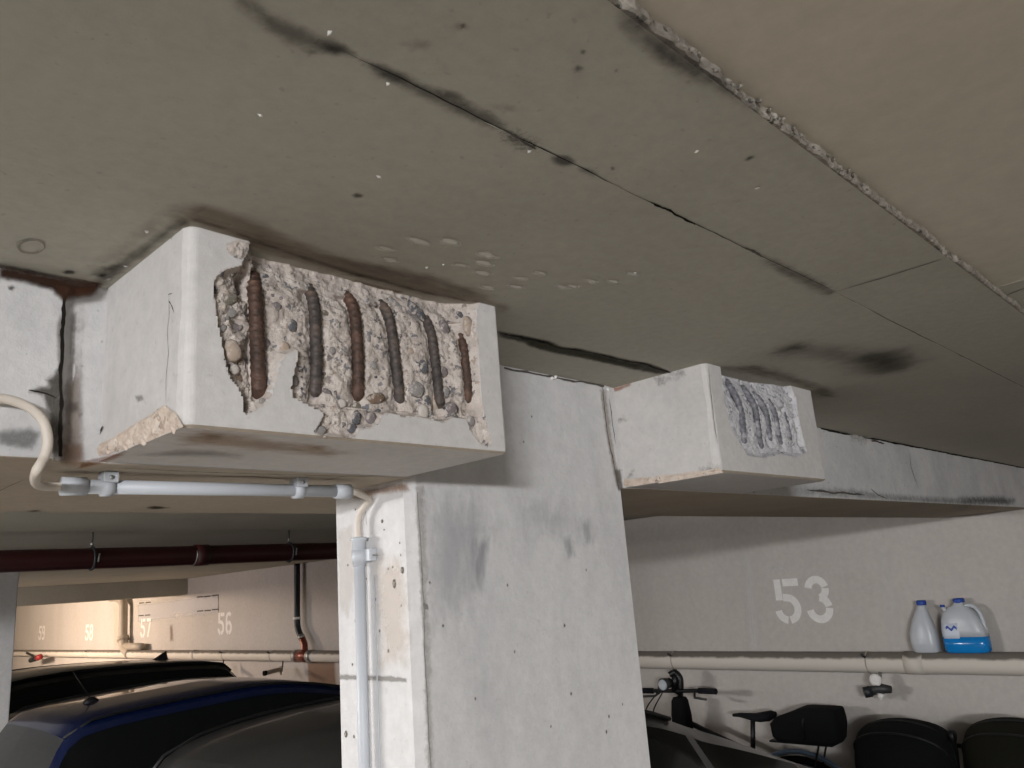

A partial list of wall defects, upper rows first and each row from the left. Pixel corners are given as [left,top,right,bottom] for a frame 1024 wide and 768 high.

crack [348,53,1023,387]
spalling [608,0,1024,315]
crack [29,299,66,456]
spalling [97,405,183,456]
spalling [213,239,491,447]
crack [501,333,670,490]
spalling [720,368,807,460]